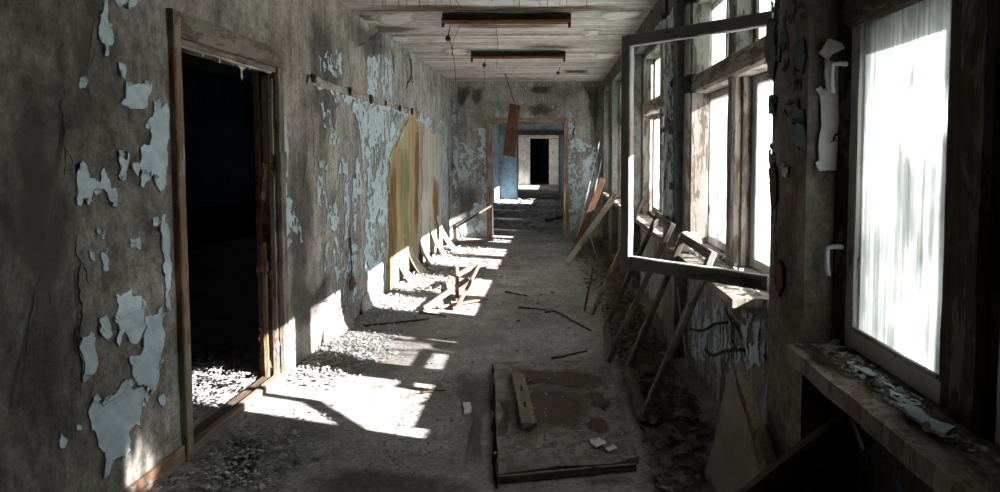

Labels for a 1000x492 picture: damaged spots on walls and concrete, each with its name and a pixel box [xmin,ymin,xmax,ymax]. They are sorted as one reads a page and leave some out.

peeling [97,0,137,56]
peeling [75,63,170,207]
peeling [311,49,487,305]
peeling [568,118,598,230]
peeling [690,0,844,380]
peeling [76,214,172,478]